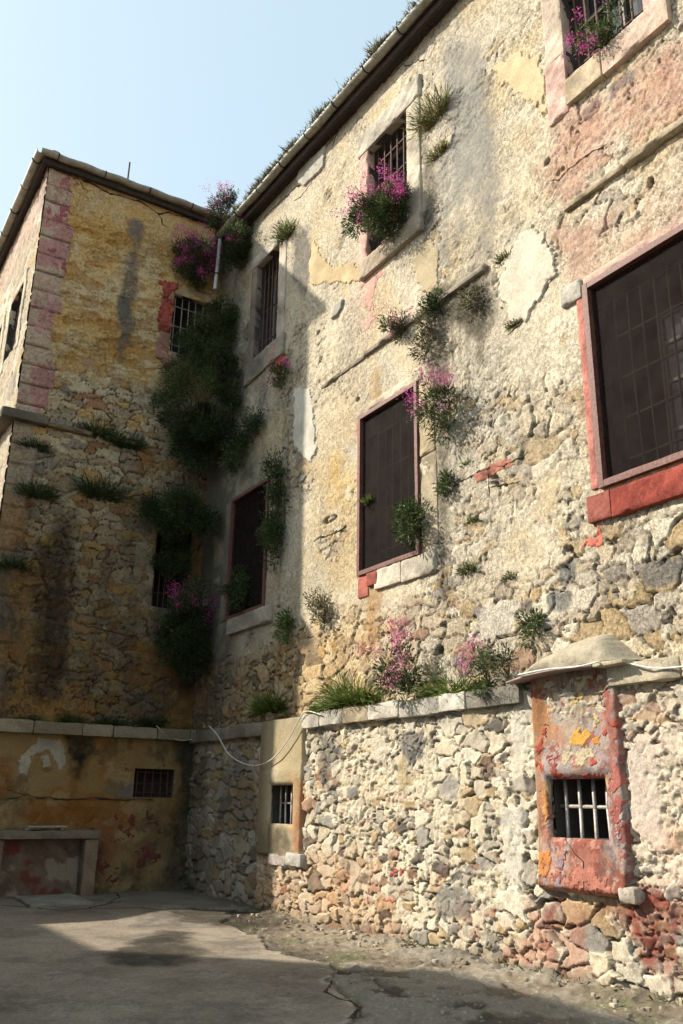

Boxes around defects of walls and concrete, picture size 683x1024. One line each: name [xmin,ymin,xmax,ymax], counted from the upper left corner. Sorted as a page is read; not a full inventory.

flaking render [492,51,548,115]
leakage [118,221,143,351]
peeling [157,280,178,333]
flaking render [308,240,385,335]
flaking render [498,224,558,324]
flaking render [293,386,318,463]
flaking render [473,458,513,483]
peeling [18,737,66,775]
crack [0,787,154,810]
peeling [533,691,630,849]
peeling [538,848,613,897]
crack [323,980,362,1020]